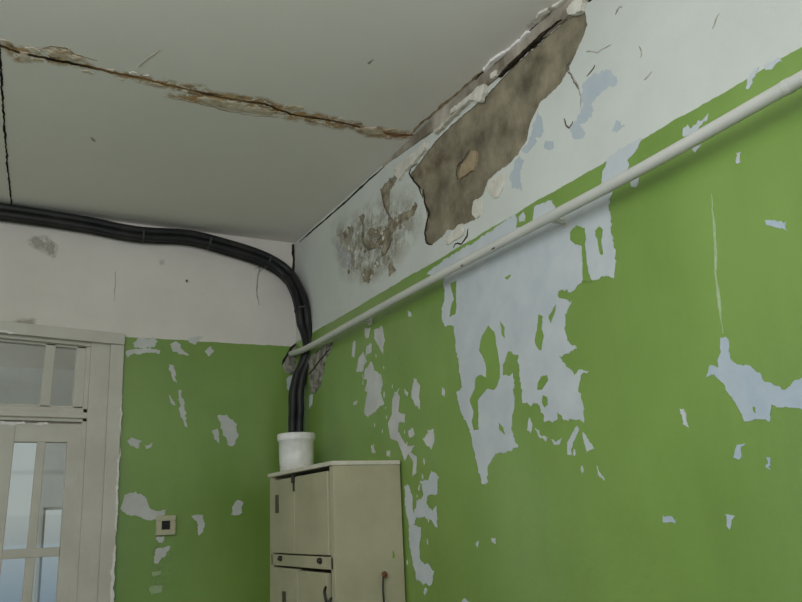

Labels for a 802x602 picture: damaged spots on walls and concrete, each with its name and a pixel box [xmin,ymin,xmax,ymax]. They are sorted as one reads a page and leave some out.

crack [0,39,414,204]
peeling [601,138,642,184]
peeling [338,0,617,485]
peeling [765,220,786,230]
peeling [126,337,160,357]
peeling [170,336,203,356]
peeling [168,364,187,427]
peeling [706,337,802,422]
peeling [127,437,152,449]
peeling [212,415,239,446]
peeling [352,326,439,594]
peeling [110,450,166,602]